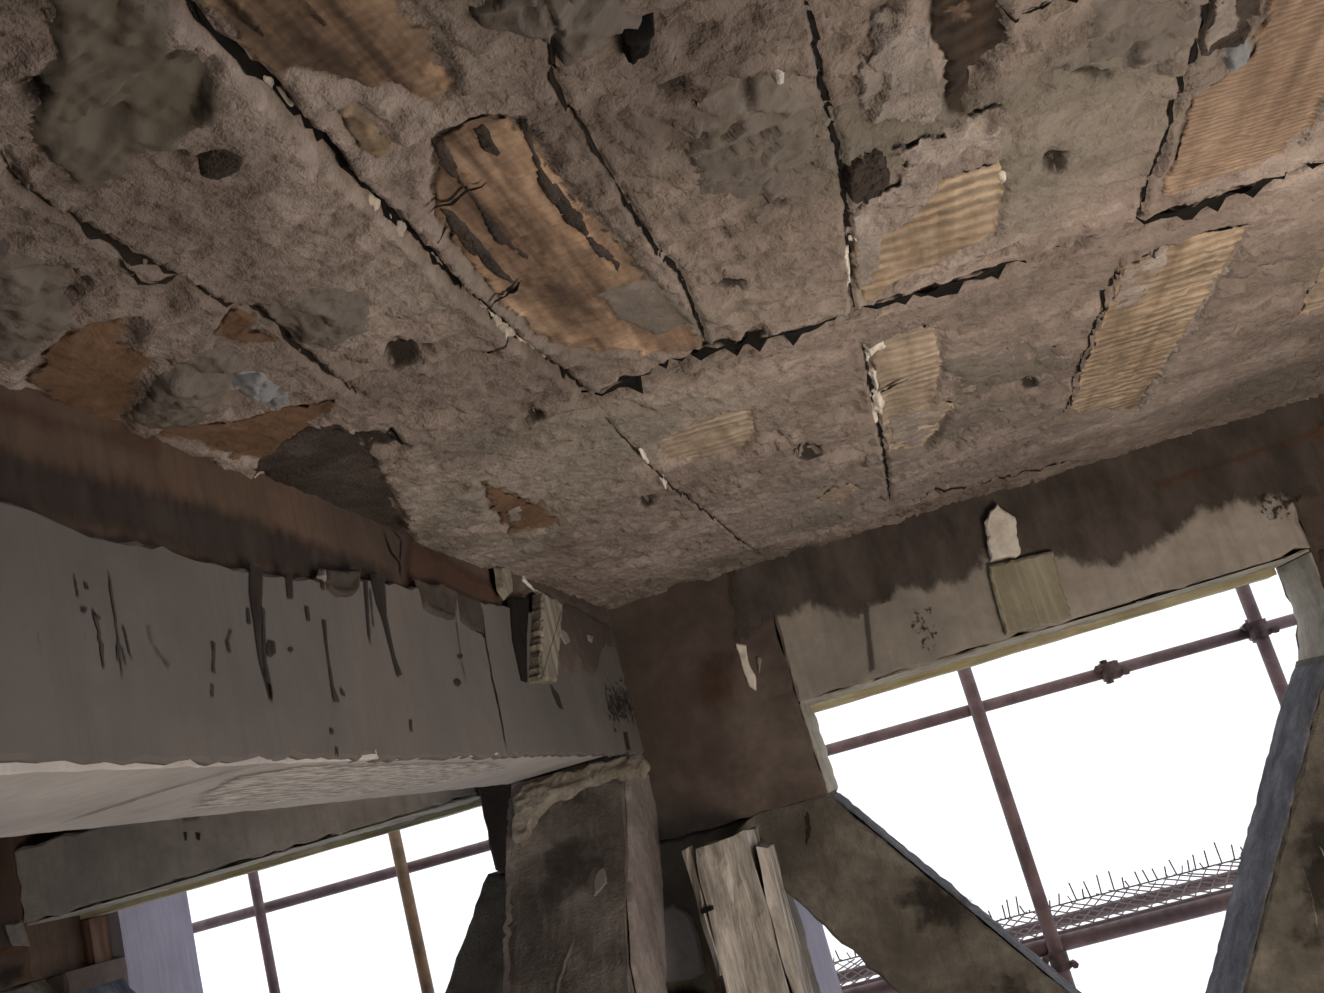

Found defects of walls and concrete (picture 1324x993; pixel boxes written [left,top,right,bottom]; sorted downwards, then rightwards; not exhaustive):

crack [1,150,357,394]
peeling [197,0,454,101]
peeling [429,115,703,356]
crack [185,0,1027,549]
peeling [871,325,955,451]
peeling [842,0,1009,300]
crack [861,342,1079,508]
crack [1063,235,1121,411]
peeling [1070,225,1249,415]
crack [1136,0,1324,225]
peeling [1161,0,1324,197]
leakage [0,451,402,702]